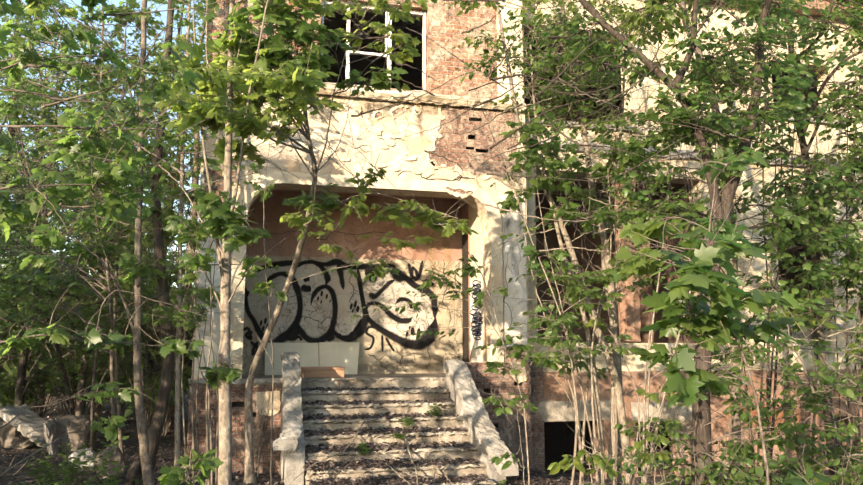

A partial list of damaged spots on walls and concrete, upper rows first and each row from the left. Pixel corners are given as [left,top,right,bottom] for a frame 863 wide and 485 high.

flaking render [371,103,524,199]